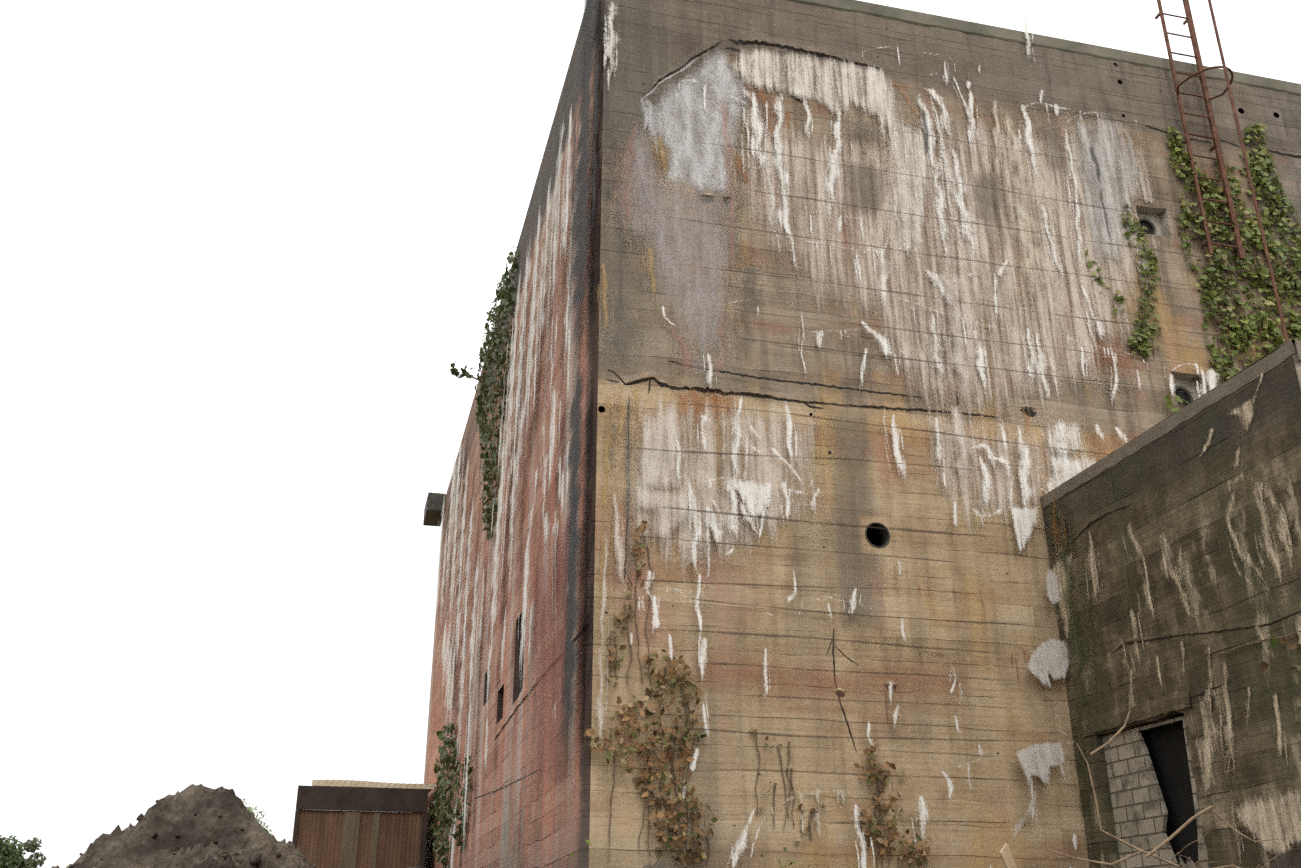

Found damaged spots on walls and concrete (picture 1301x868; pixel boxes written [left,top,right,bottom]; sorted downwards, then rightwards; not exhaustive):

crack [1145,125,1301,158]
crack [941,309,991,330]
damp [435,0,618,868]
crack [606,361,1002,584]
damp [597,48,1155,830]
damp [1123,524,1191,707]
damp [1199,648,1233,789]
damp [1273,695,1287,757]
damp [837,790,875,868]
damp [912,795,928,842]
damp [1231,790,1301,855]